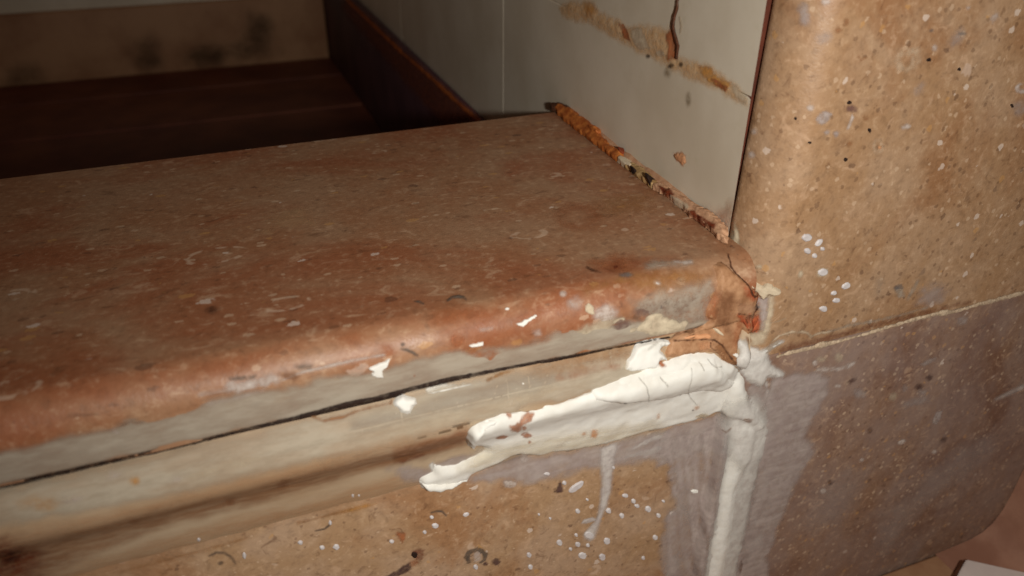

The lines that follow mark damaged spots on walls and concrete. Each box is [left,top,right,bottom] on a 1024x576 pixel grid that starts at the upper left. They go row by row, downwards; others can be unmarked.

crack [671,0,681,59]
peeling [666,30,676,59]
peeling [700,67,729,91]
peeling [617,155,631,167]
crack [728,254,758,315]
peeling [685,328,724,350]
crack [0,337,733,490]